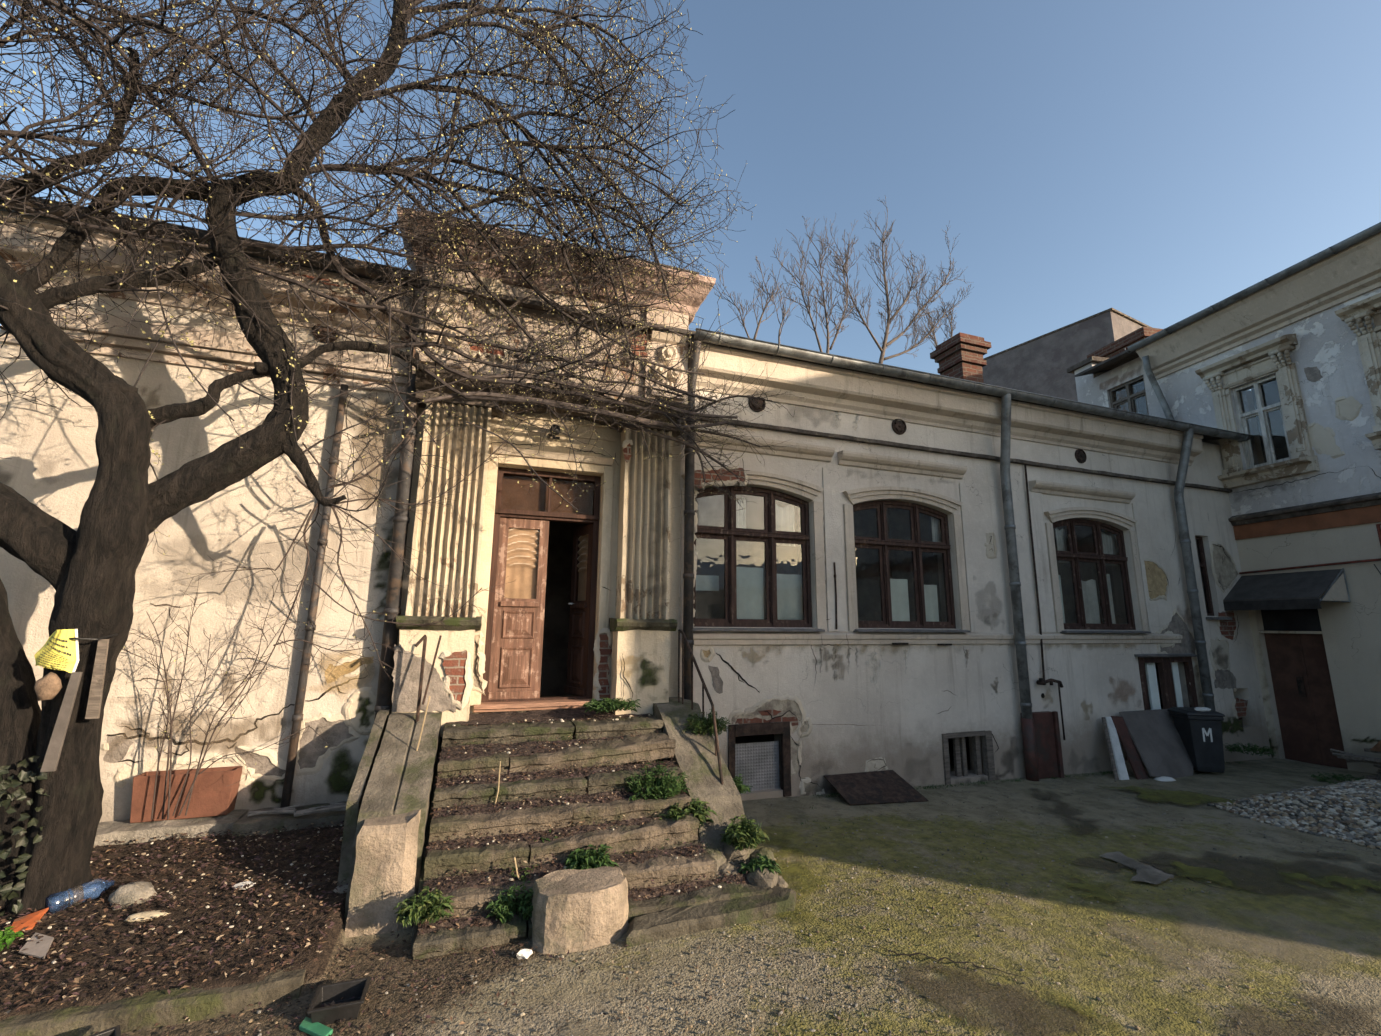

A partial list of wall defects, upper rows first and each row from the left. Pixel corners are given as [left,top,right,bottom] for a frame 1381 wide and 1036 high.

peeling [1304,366,1323,382]
flaking render [160,632,488,787]
flaking render [728,694,825,795]
peeling [1144,558,1248,719]